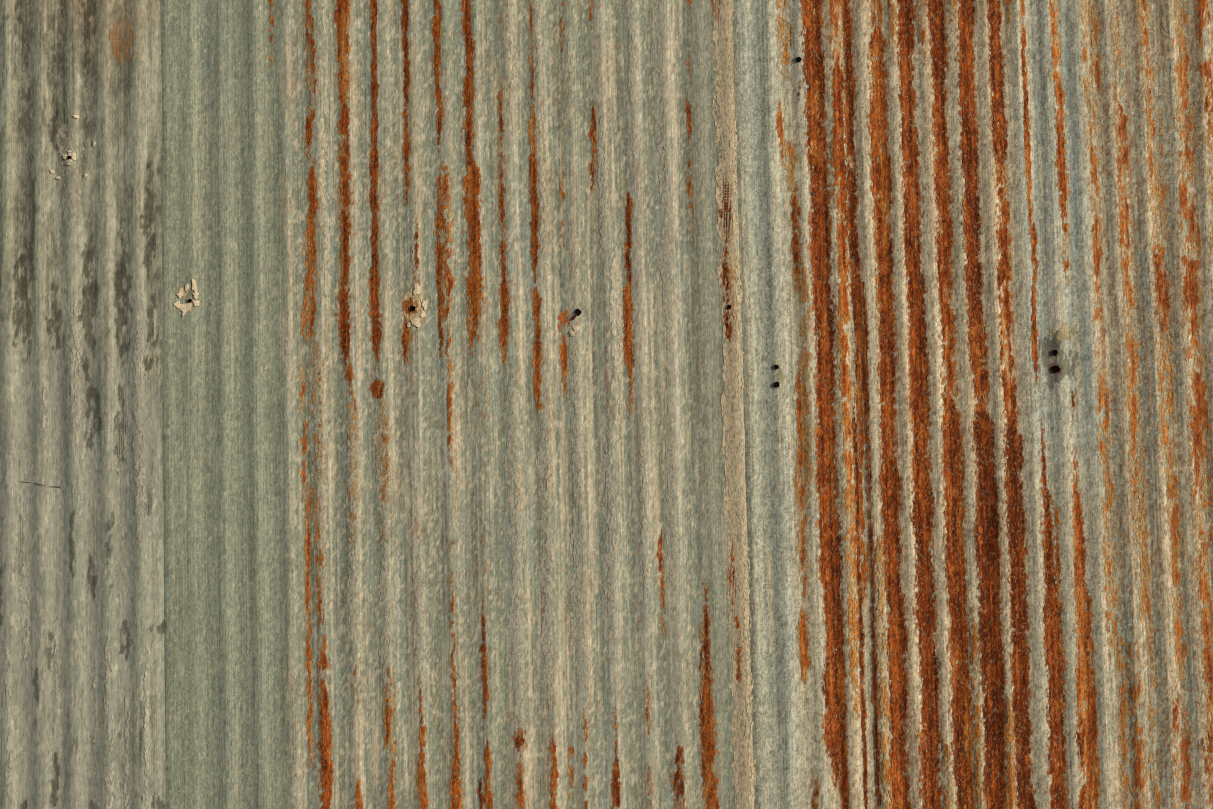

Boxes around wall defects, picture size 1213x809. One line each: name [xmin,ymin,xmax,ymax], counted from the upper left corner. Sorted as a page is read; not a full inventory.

rust [298,0,334,809]
rust [333,0,359,542]
rust [368,0,389,508]
rust [400,0,411,205]
rust [431,0,486,463]
rust [497,83,511,367]
rust [528,0,543,422]
rust [620,192,636,415]
rust [776,0,1213,809]
rust [449,572,494,809]
rust [610,709,621,809]
rust [698,583,720,809]